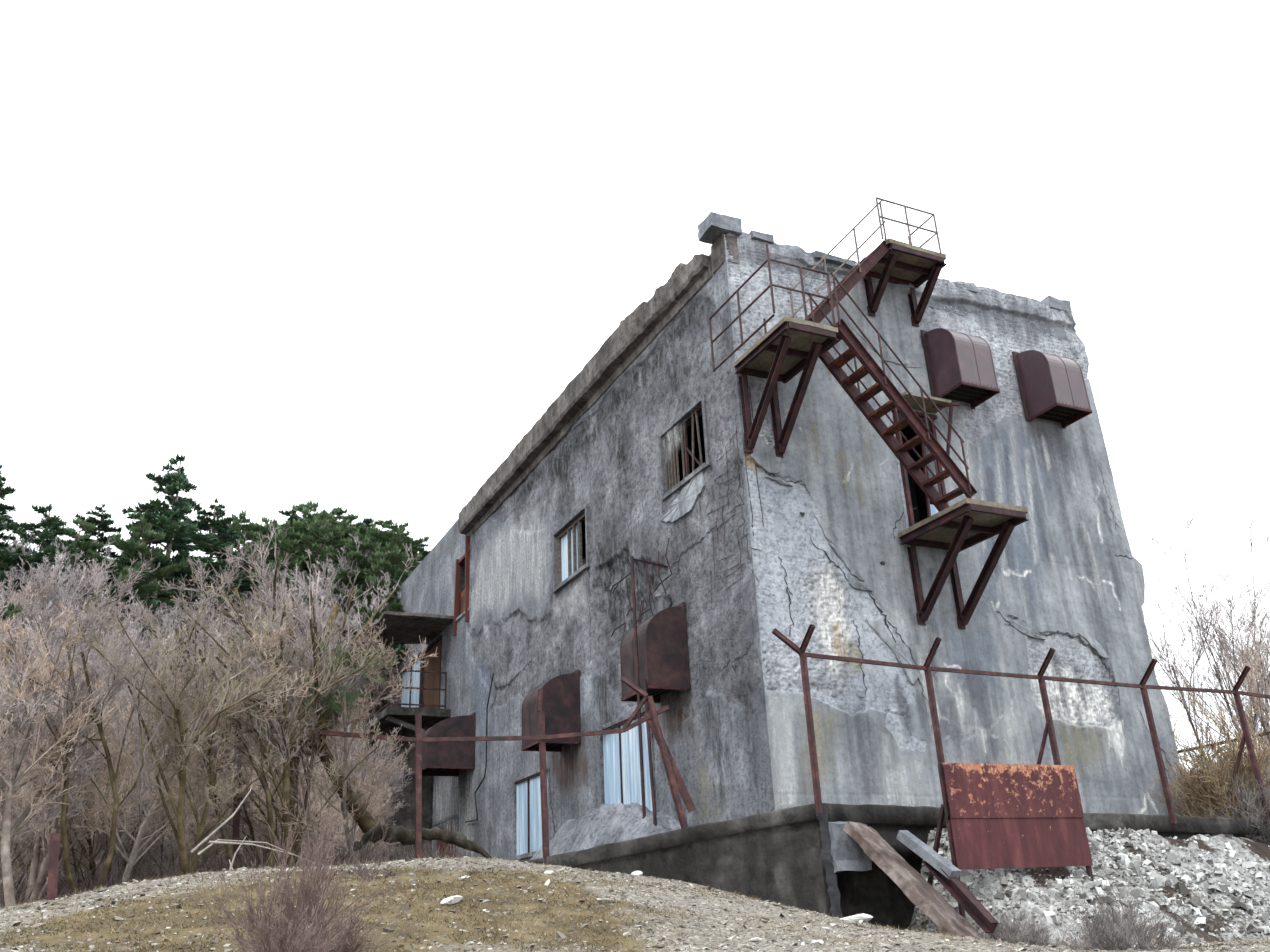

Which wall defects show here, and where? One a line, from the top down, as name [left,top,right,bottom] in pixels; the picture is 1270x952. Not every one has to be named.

spalling [841,278,1089,446]
spalling [467,232,926,752]
crack [805,530,933,733]
spalling [999,611,1119,729]